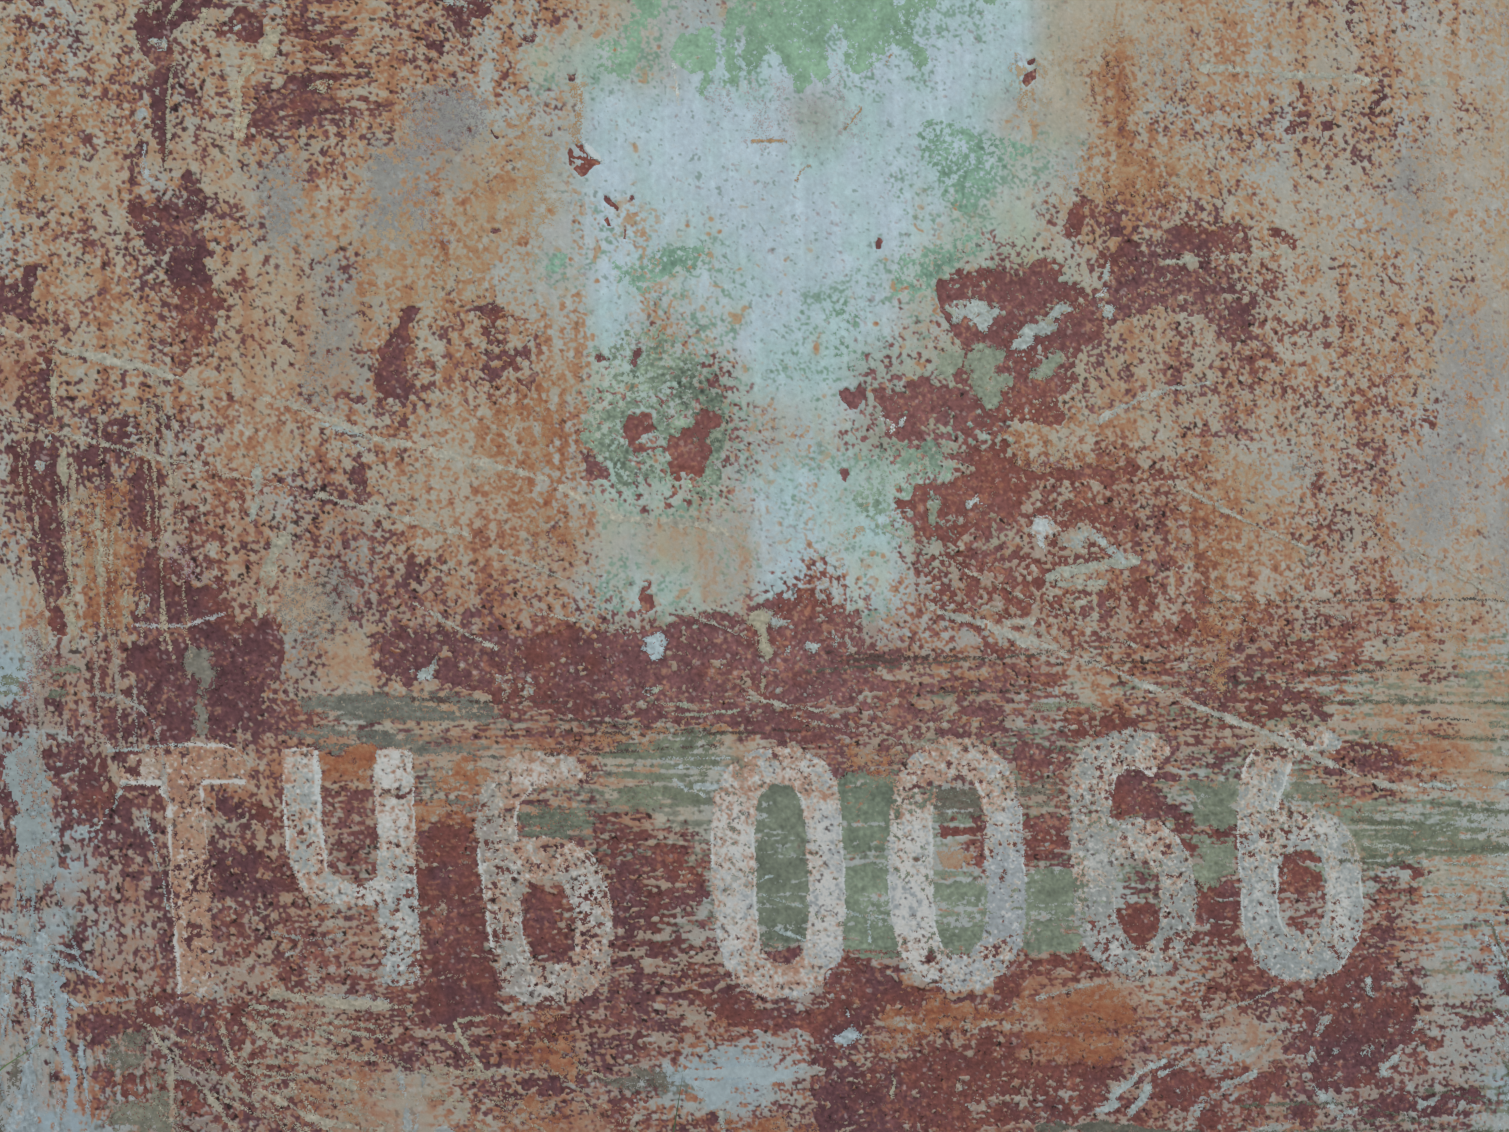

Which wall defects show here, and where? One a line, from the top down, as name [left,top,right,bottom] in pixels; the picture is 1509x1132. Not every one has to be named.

rust [351,73,595,328]
peeling [1062,200,1087,240]
rust [473,370,592,566]
peeling [623,409,724,482]
peeling [839,209,1300,659]
rust [60,479,144,632]
rust [1168,437,1282,706]
peeling [379,579,1006,753]
peeling [1011,708,1162,778]
rust [482,1000,590,1132]
peeling [414,823,684,1054]
rust [877,982,1152,1067]